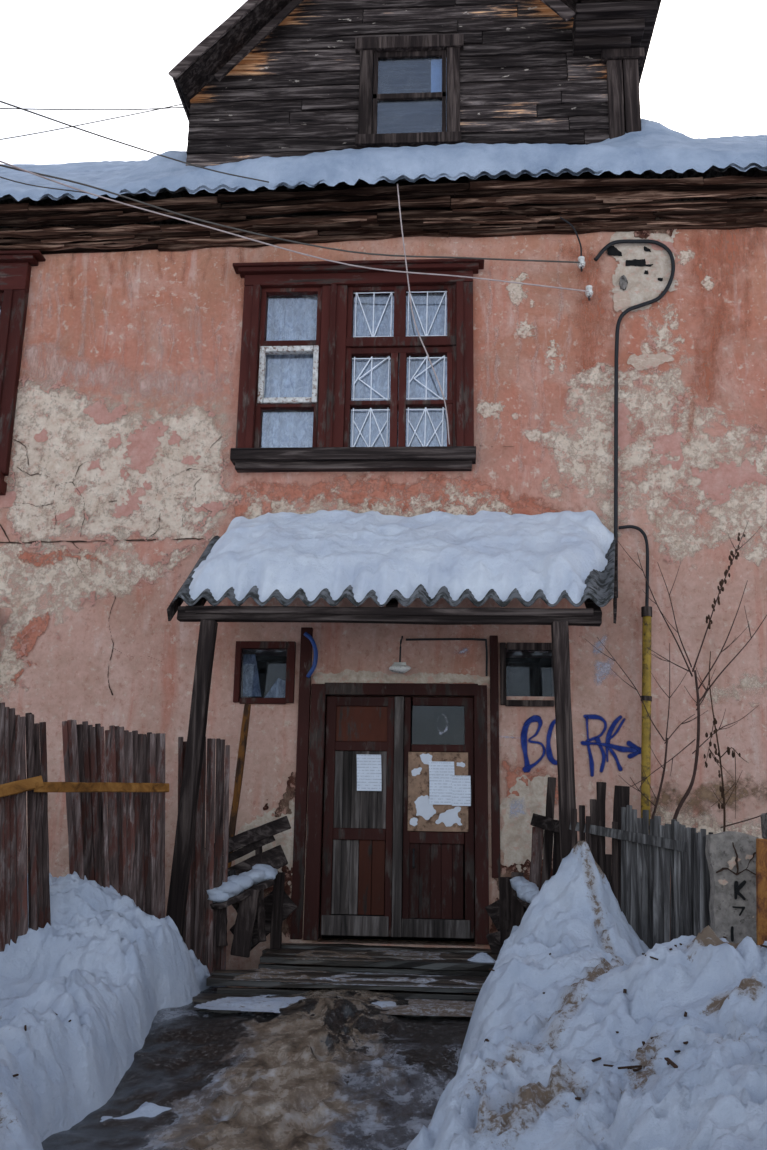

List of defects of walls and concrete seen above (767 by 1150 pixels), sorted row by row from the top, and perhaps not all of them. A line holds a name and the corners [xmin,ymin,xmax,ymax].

crack [0,436,222,578]
peeling [0,218,767,701]
crack [108,596,157,695]
spalling [491,760,558,901]